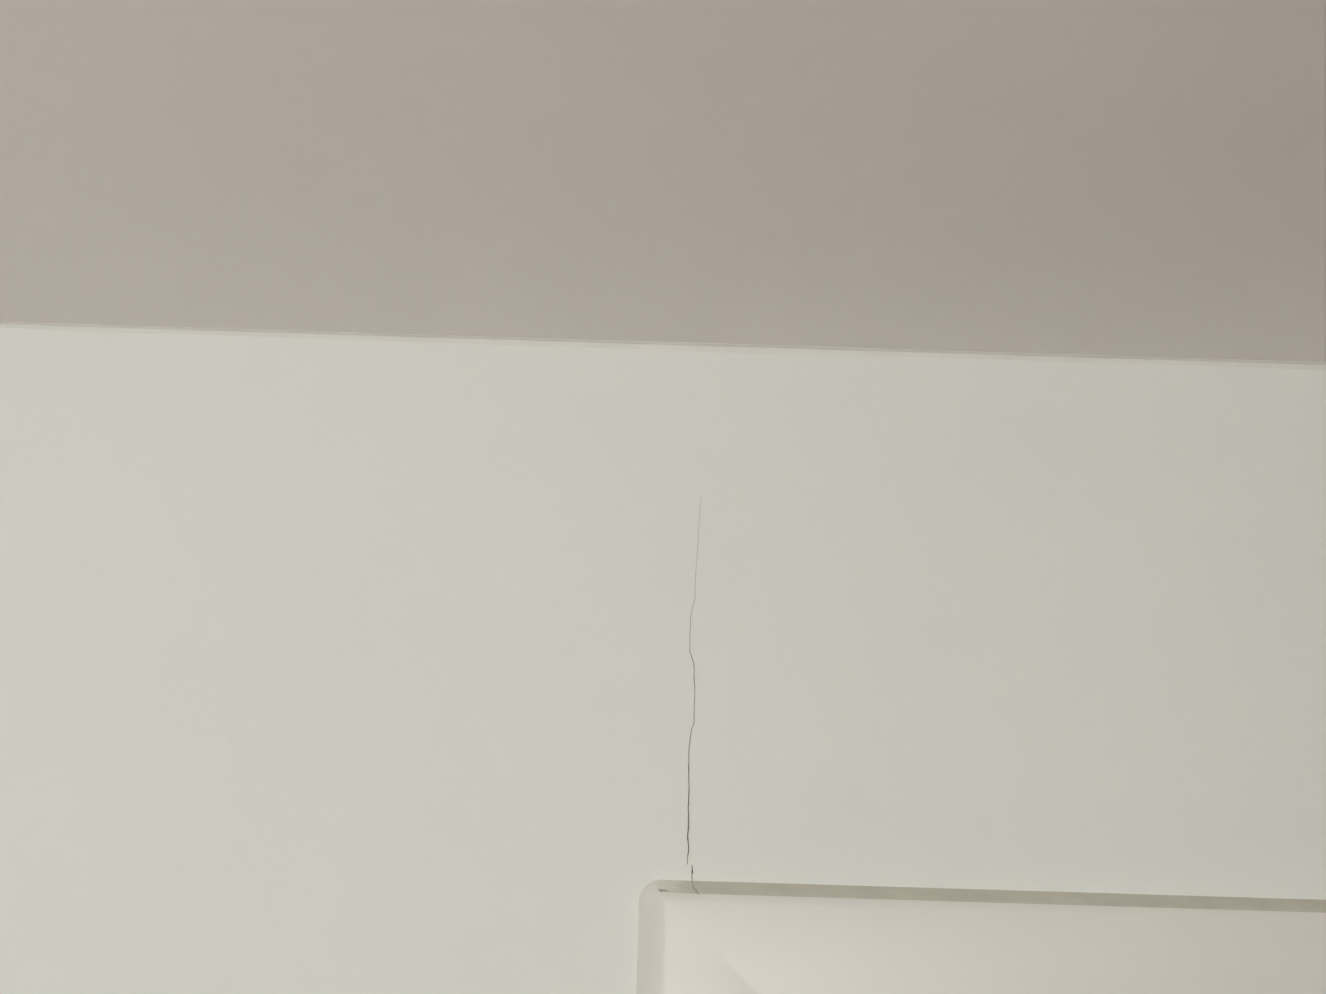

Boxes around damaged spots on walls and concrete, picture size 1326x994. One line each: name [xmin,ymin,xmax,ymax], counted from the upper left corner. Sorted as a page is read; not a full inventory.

crack [658,502,701,895]